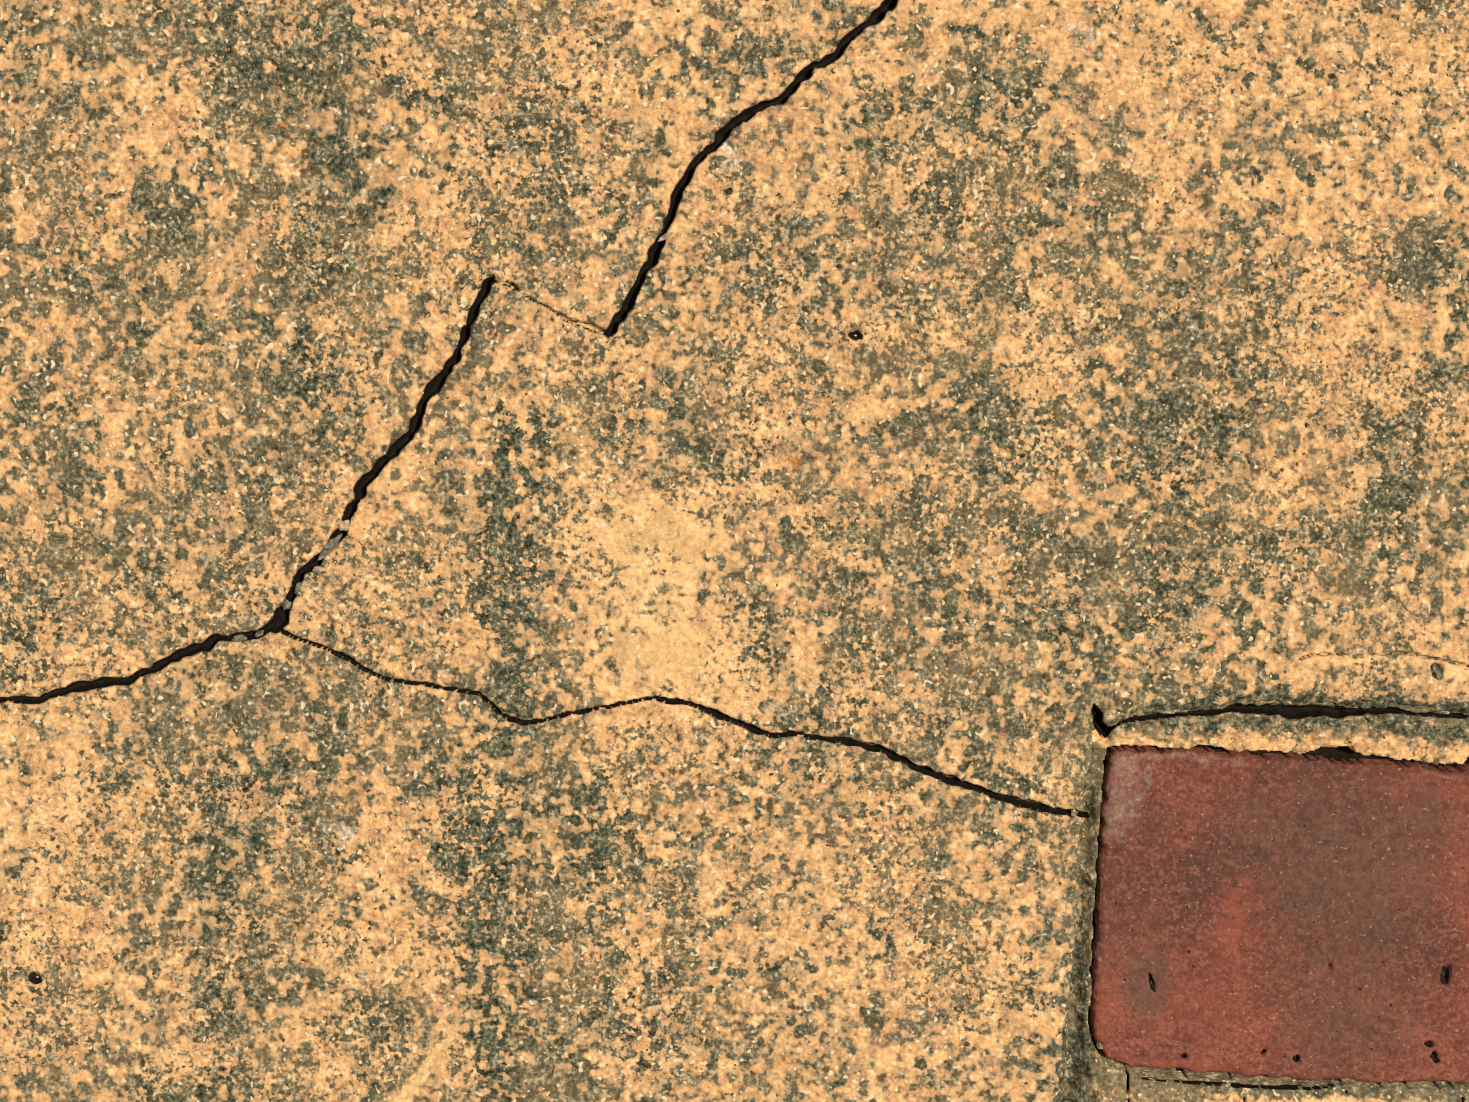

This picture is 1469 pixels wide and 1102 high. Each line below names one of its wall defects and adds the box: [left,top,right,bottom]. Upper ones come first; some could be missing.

crack [0,0,1469,844]
crack [1088,907,1096,971]